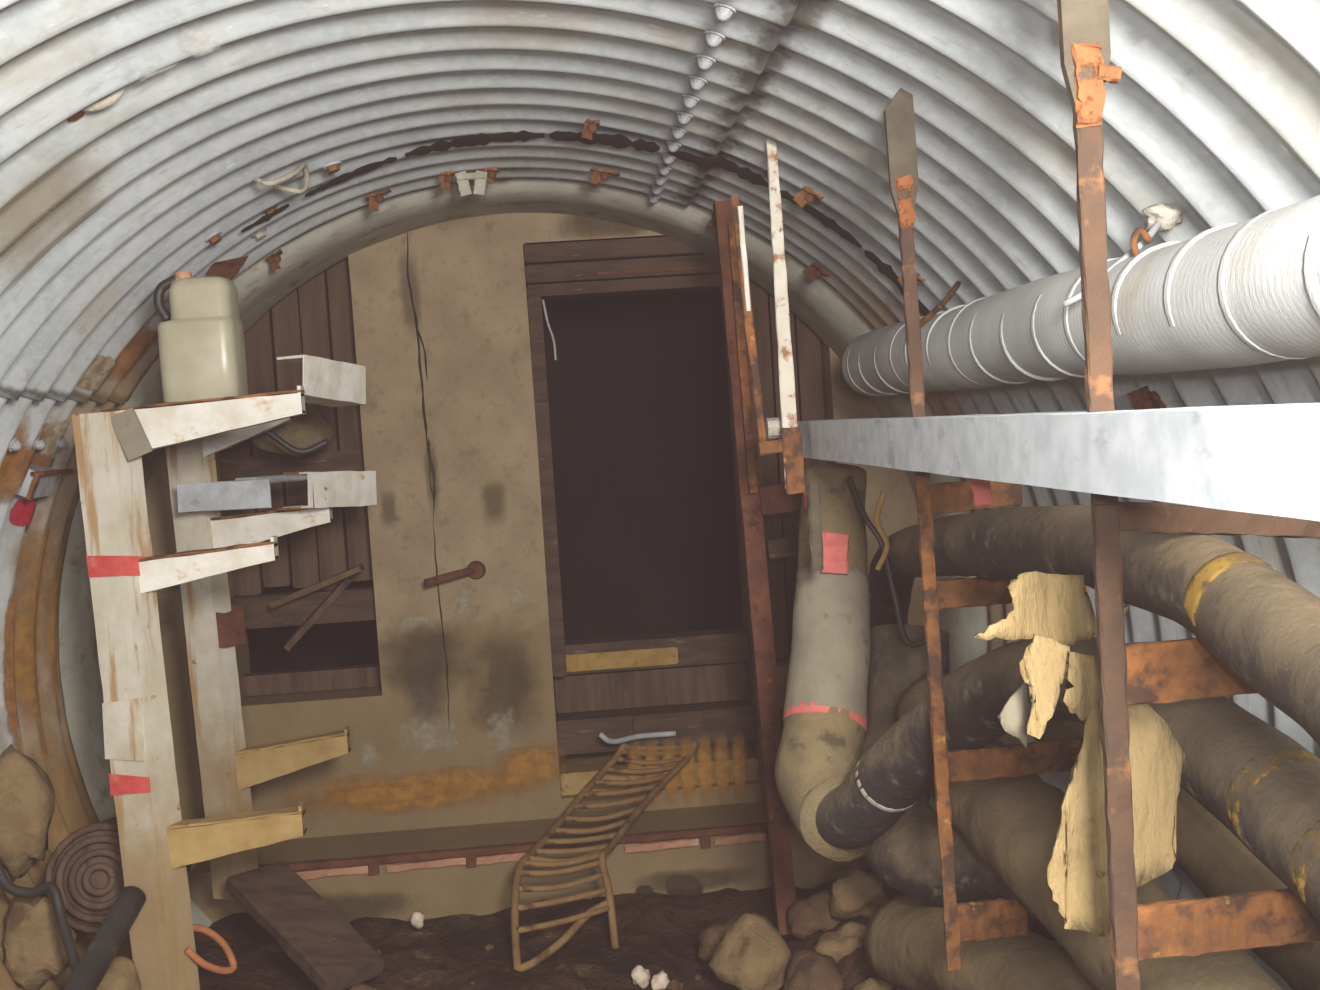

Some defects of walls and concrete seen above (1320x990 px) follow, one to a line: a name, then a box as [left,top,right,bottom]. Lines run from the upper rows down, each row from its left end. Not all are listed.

corrosion [896,174,916,229]
corrosion [0,427,25,476]
corrosion [26,468,73,500]
crack [407,232,450,727]
corrosion [4,535,62,745]